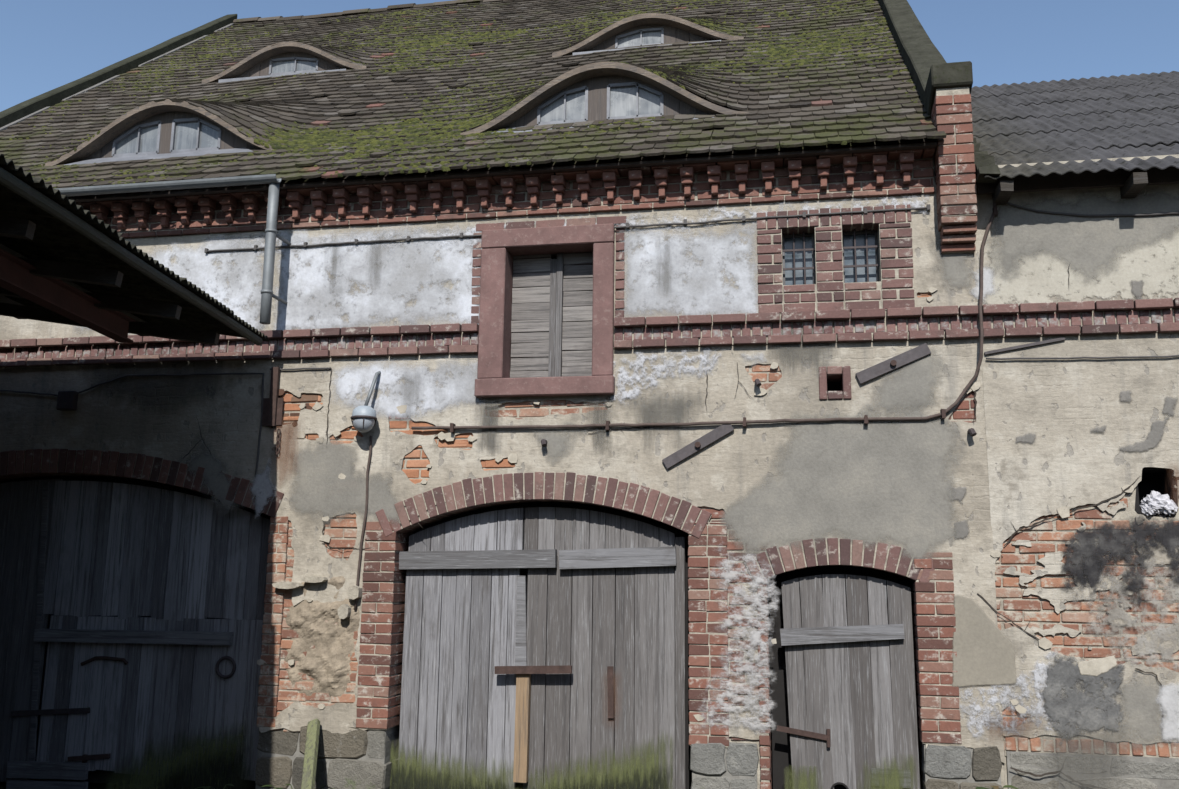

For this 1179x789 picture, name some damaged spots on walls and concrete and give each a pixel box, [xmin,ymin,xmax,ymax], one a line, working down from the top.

spalling [271,389,363,444]
peeling [336,347,721,484]
spalling [743,354,782,396]
spalling [948,381,981,423]
damp [1082,556,1101,592]
damp [1122,551,1145,604]
damp [1170,557,1179,584]
spalling [270,513,359,732]
peeling [694,506,777,741]
spalling [960,467,1179,751]